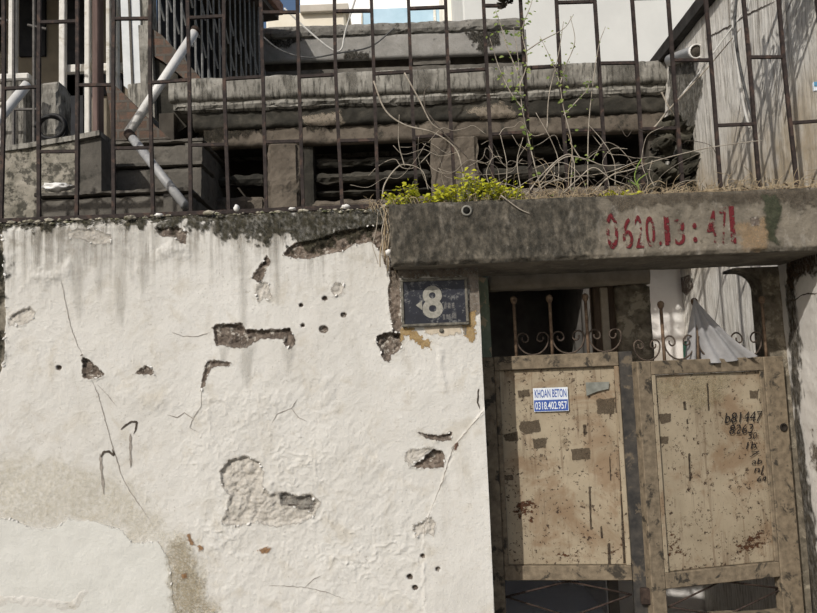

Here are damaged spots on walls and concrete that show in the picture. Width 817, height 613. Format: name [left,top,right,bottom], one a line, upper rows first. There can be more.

damp [607,188,817,250]
damp [0,250,11,303]
spalling [283,225,477,362]
damp [389,196,599,315]
spalling [81,354,104,379]
spalling [200,360,230,391]
spalling [212,322,295,349]
crack [95,388,153,526]
spalling [220,455,321,527]
spalling [405,432,452,469]
crack [424,389,483,534]
damp [785,254,817,613]